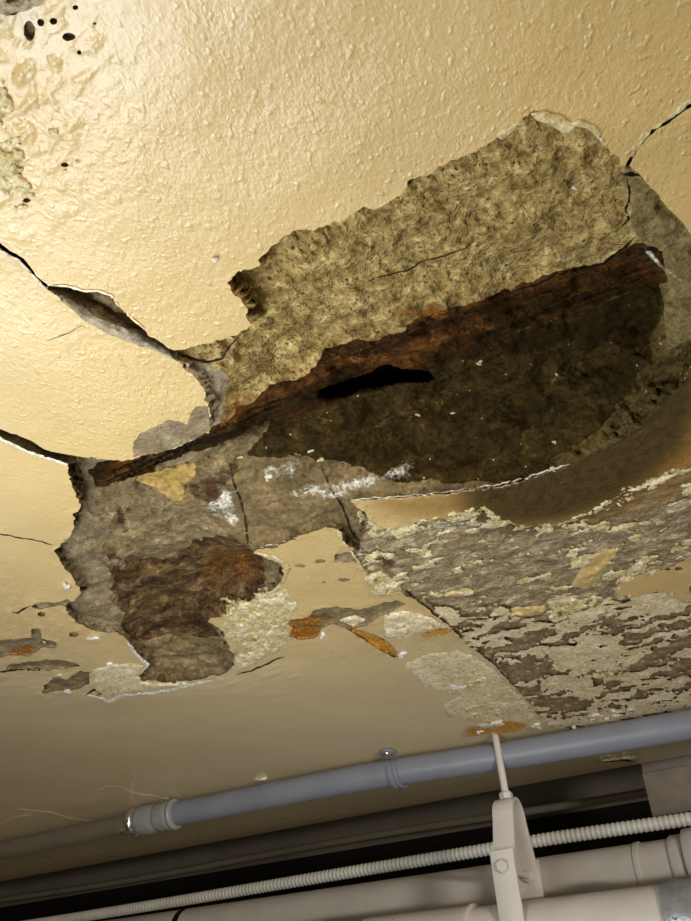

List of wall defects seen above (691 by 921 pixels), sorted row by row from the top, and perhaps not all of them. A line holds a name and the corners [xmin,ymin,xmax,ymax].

crack [626,98,691,166]
crack [0,243,176,361]
spalling [0,110,691,734]
crack [0,429,86,466]
corrosion [287,616,335,639]
corrosion [352,629,400,655]
corrosion [463,721,525,737]